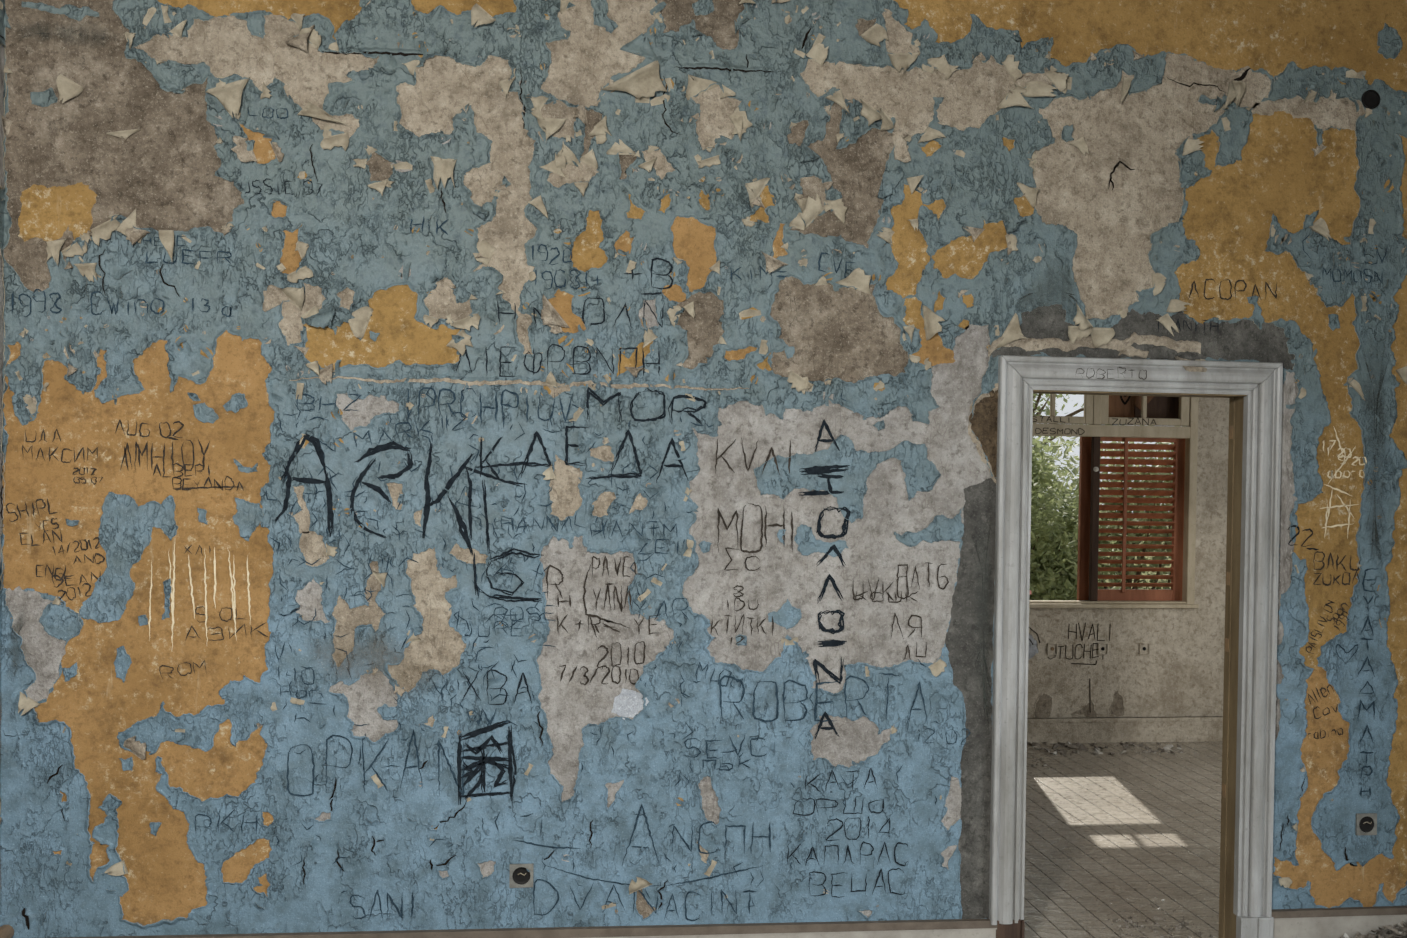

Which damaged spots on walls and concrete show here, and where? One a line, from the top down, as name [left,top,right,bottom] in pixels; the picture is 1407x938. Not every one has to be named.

peeling [341,140,420,212]
crack [1105,157,1135,192]
peeling [267,198,291,220]
peeling [958,288,981,309]
peeling [520,361,579,400]
peeling [330,384,426,439]
peeling [316,506,491,745]
peeling [526,533,677,805]
peeling [1071,685,1125,718]
peeling [1275,659,1288,742]
peeling [220,807,277,912]
peeling [688,837,717,897]